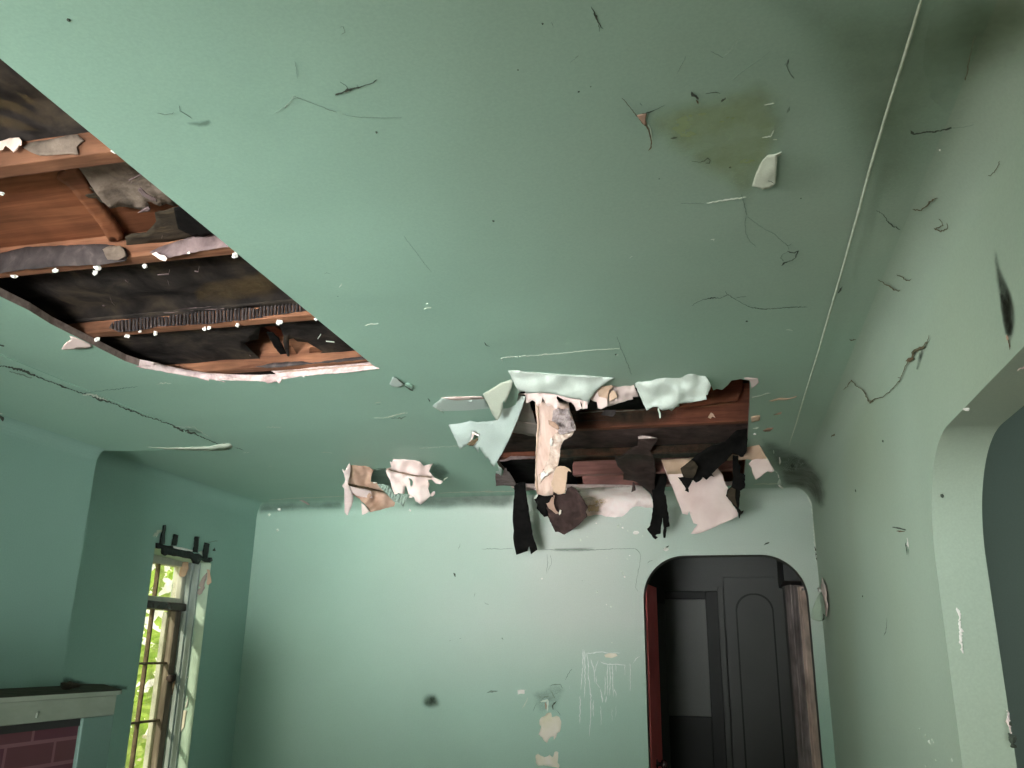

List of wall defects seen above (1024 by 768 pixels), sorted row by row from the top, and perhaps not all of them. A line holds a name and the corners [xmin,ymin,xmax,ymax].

crack [276,80,402,118]
crack [622,98,677,151]
peeling [752,151,782,189]
crack [681,197,799,265]
peeling [62,336,92,350]
crack [0,344,249,453]
spalling [136,363,380,384]
peeling [433,370,711,488]
peeling [342,459,448,515]
spalling [566,484,653,518]
peeling [661,415,783,534]
peeling [533,669,572,768]